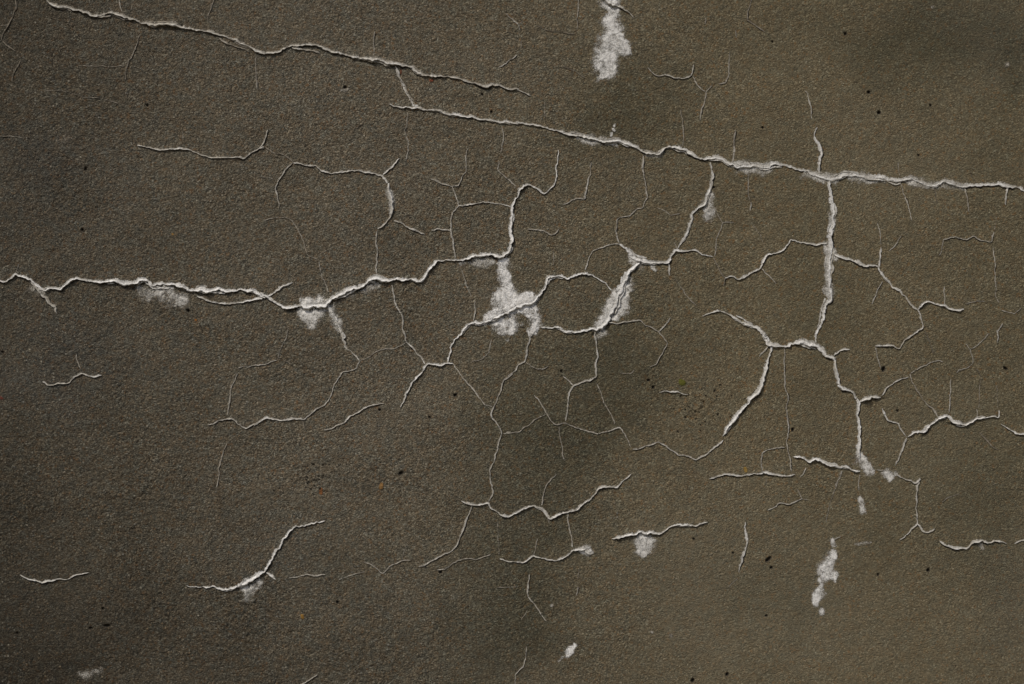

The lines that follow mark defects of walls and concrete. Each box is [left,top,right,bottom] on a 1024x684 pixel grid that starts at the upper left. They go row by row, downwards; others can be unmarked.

crack [43,0,1024,480]
crack [0,149,631,567]
crack [20,572,89,583]
crack [186,520,325,592]
crack [339,541,410,580]
crack [438,554,491,570]
crack [499,574,546,621]
crack [612,522,708,540]
crack [728,522,748,588]
crack [794,455,860,522]
crack [897,475,935,540]
crack [940,539,1024,551]